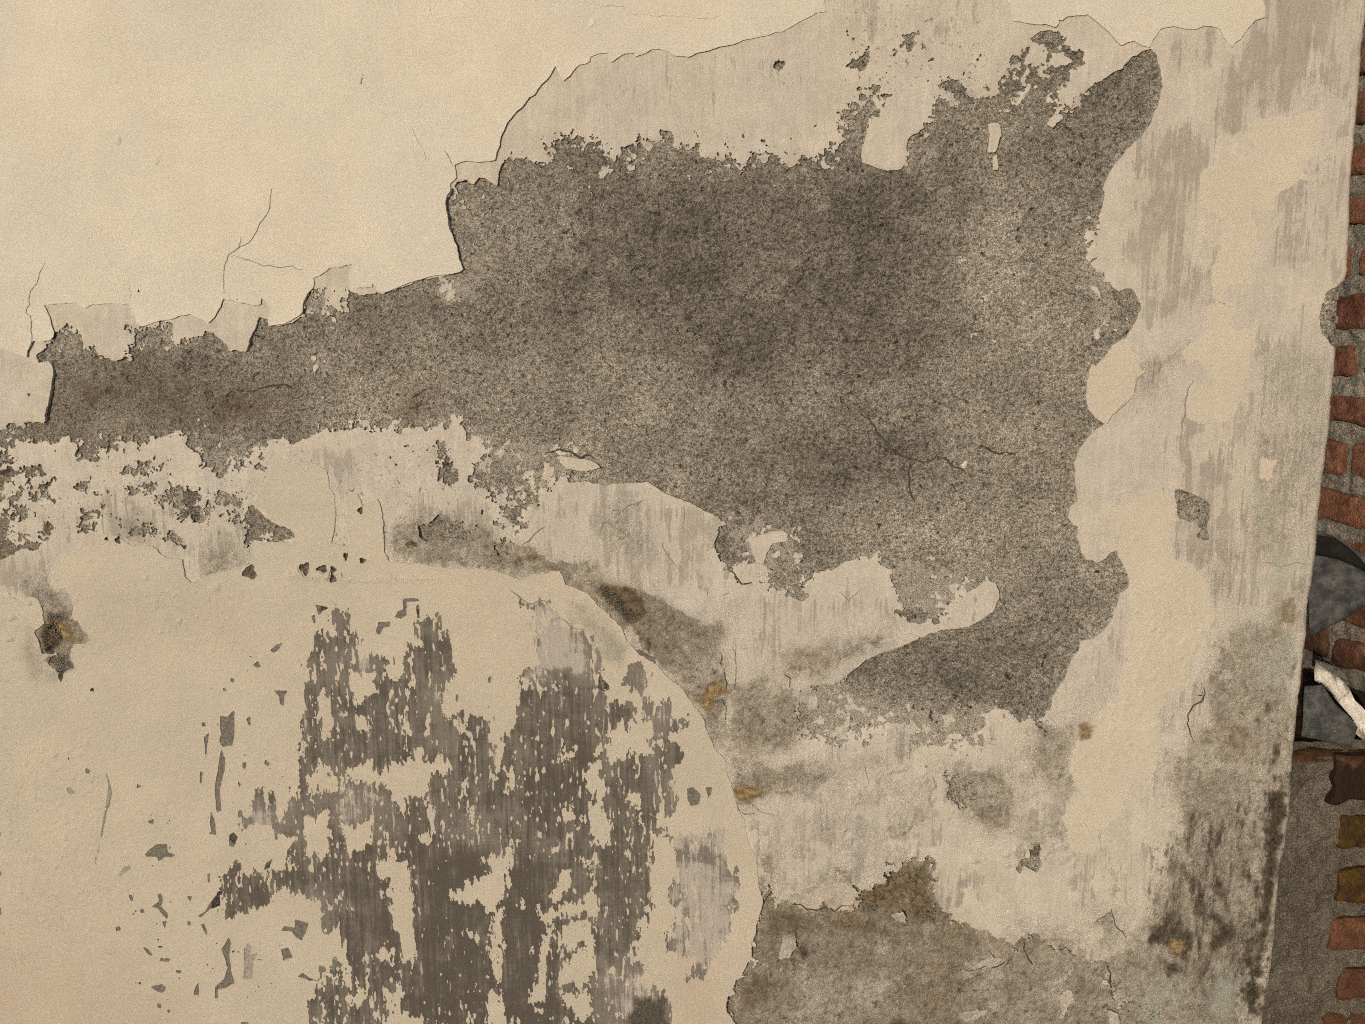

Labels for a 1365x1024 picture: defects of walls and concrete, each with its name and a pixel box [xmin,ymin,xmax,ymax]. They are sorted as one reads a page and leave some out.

crack [223,194,302,305]
crack [811,338,903,351]
crack [824,413,1019,502]
spalling [299,562,337,583]
peeling [310,689,334,741]
peeling [348,664,404,732]
peeling [200,711,251,847]
peeling [489,742,515,793]
peeling [299,746,475,1024]
peeling [450,762,712,1024]
peeling [215,938,258,998]
peeling [281,920,308,960]